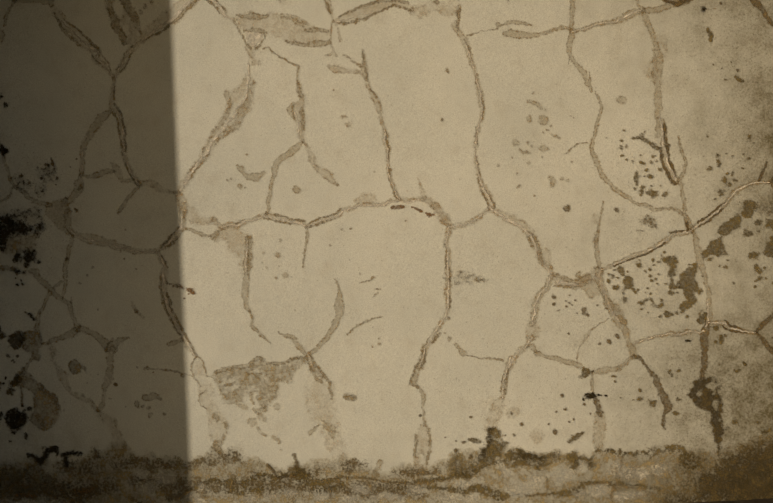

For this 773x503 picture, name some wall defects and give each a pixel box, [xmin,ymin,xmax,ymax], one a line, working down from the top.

crack [492,1,678,39]
crack [750,0,773,26]
mould [619,129,668,198]
mould [12,248,41,286]
mould [0,159,58,252]
crack [0,0,421,448]
crack [411,8,773,485]
mould [607,200,773,318]
leakage [0,405,32,442]
crack [266,454,389,489]
leakage [0,421,773,503]